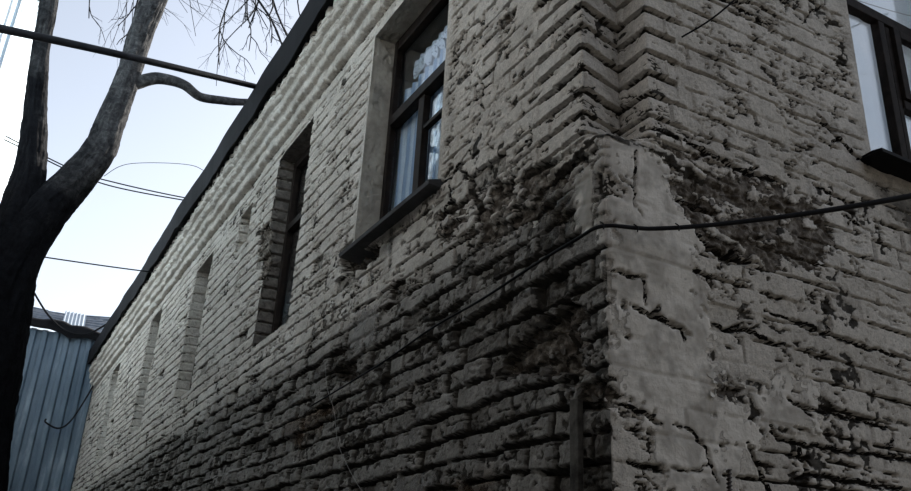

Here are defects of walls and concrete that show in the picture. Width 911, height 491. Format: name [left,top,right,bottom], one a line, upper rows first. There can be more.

spalling [655,139,836,281]